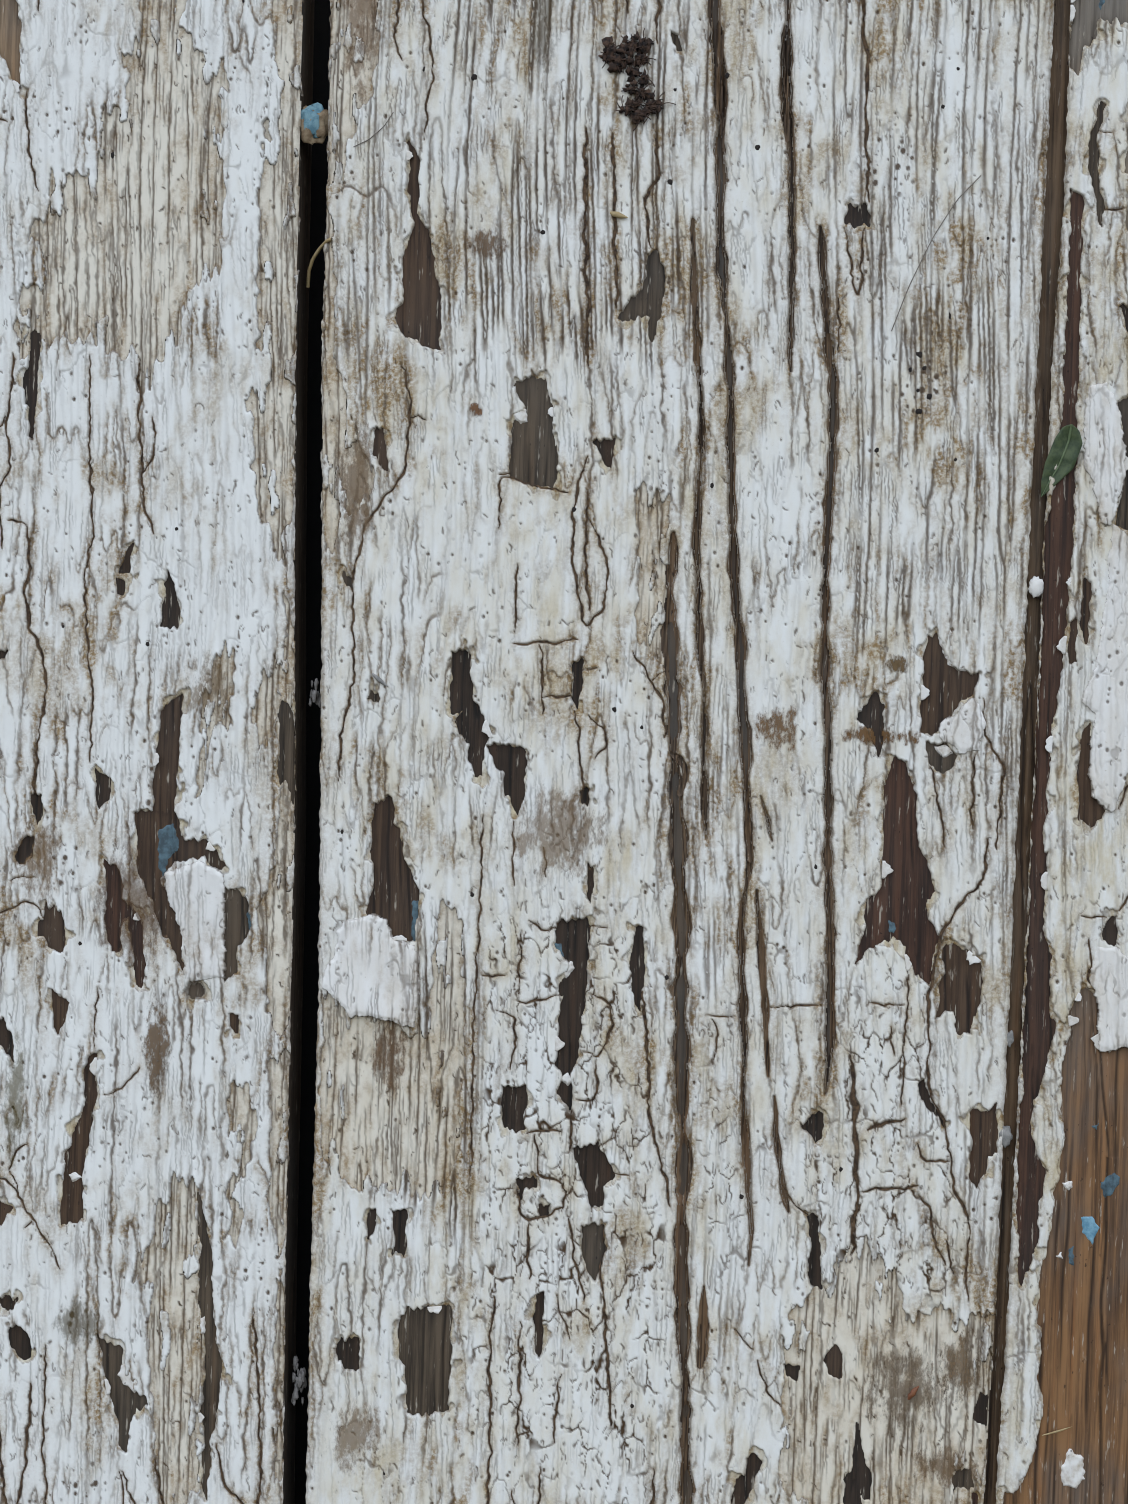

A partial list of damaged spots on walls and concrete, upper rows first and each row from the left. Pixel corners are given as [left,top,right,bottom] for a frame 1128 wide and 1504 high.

crack [0,354,48,795]
crack [0,1346,48,1504]
peeling [95,594,295,1504]
peeling [318,796,466,1257]
peeling [450,650,527,815]
crack [486,1296,561,1504]
crack [469,817,606,1176]
crack [498,456,609,790]
crack [517,991,670,1426]
peeling [731,1213,995,1504]
peeling [855,692,983,1035]
peeling [1003,101,1128,1504]